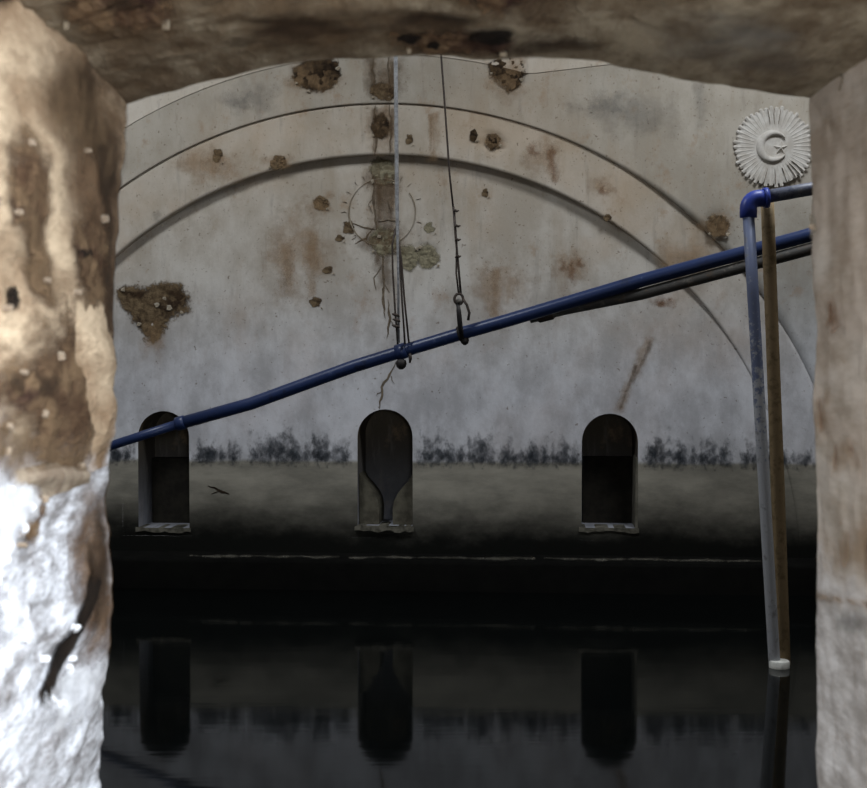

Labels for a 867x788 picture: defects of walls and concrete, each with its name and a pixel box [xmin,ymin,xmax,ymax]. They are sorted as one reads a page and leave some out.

spalling [292,59,341,93]
spalling [386,30,526,94]
spalling [371,112,389,139]
damp [56,54,123,364]
spalling [705,214,730,237]
spalling [73,213,109,309]
spalling [117,281,191,343]
damp [71,492,113,652]
crack [39,555,103,709]